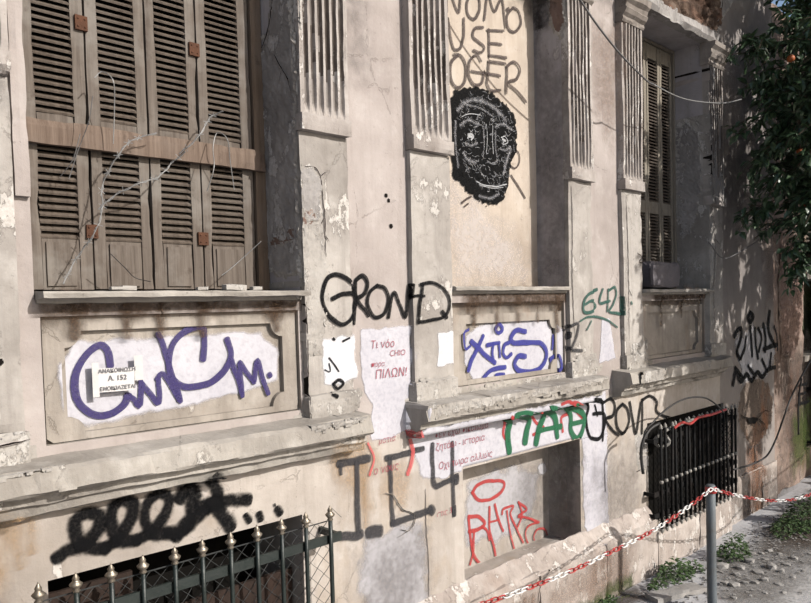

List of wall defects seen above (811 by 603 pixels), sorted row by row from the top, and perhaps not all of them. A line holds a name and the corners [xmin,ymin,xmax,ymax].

spalling [261,0,329,356]
peeling [675,113,718,356]